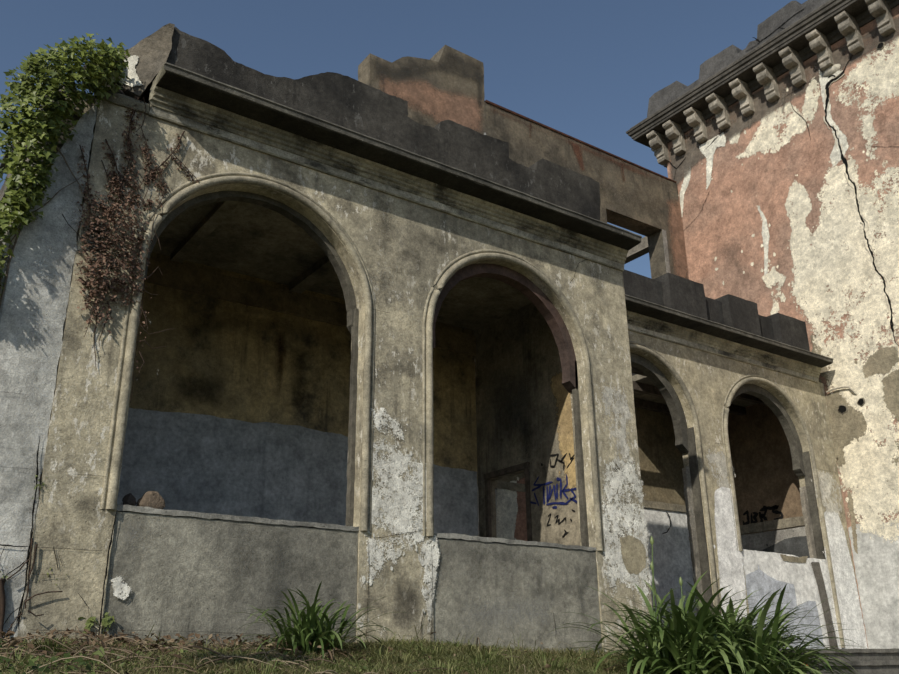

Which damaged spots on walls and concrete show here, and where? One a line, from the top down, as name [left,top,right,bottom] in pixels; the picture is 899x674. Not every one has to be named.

peeling [670,170,691,279]
crack [785,55,899,346]
peeling [699,36,899,649]
crack [0,438,117,639]
peeling [111,576,131,600]
peeling [362,407,440,620]
peeling [601,379,652,610]